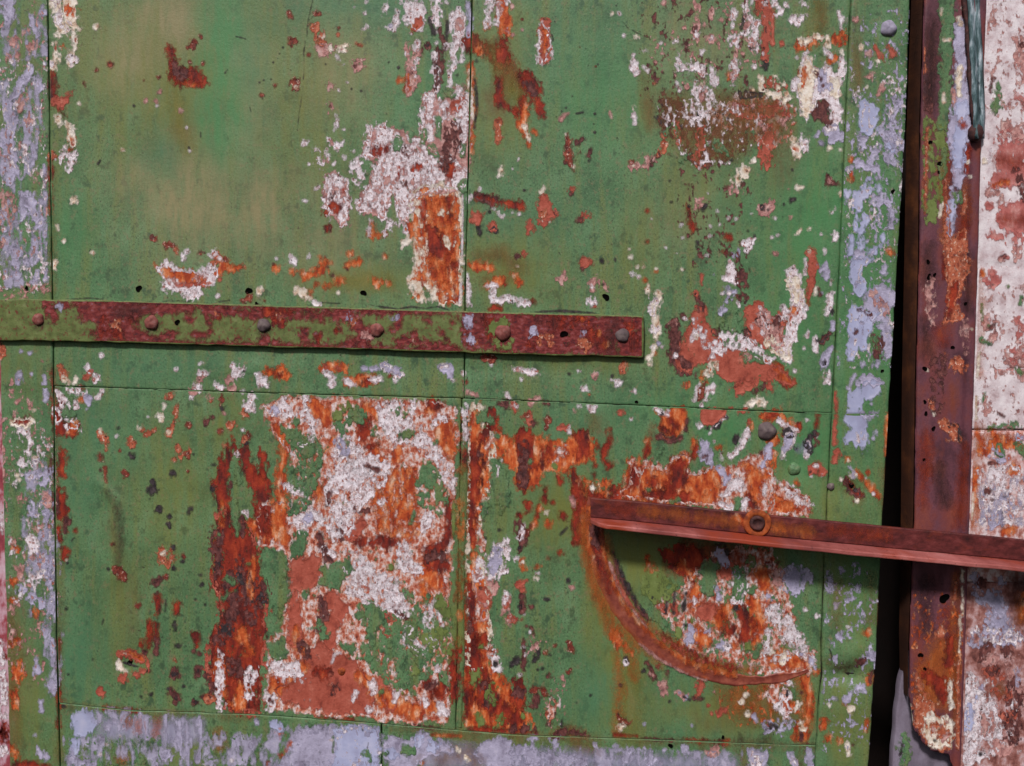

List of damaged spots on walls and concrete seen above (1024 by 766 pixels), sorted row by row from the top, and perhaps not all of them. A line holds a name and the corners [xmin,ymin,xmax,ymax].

peeling [0,0,99,300]
rust [42,181,642,356]
peeling [301,0,523,258]
rust [461,29,546,154]
peeling [580,0,909,517]
rust [923,159,985,443]
peeling [976,0,1024,530]
rust [190,435,282,719]
peeling [0,353,769,766]
rust [452,402,817,747]
rust [910,570,964,753]
peeling [963,571,1024,766]